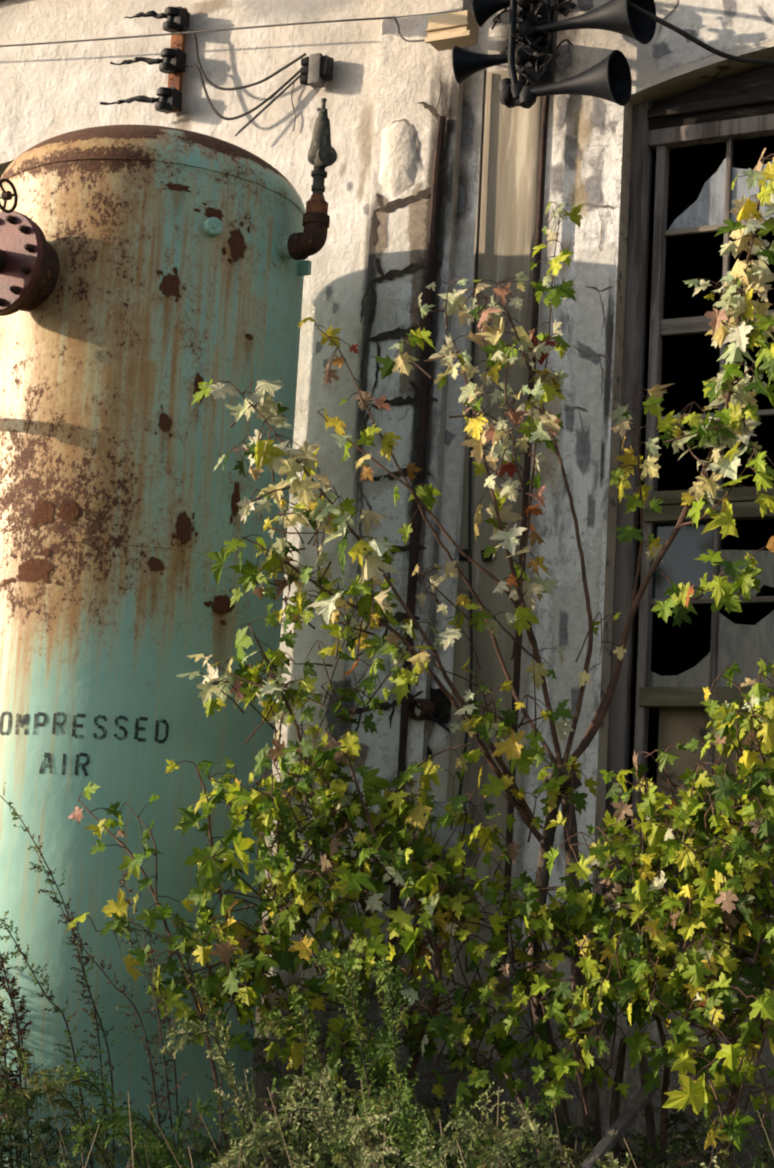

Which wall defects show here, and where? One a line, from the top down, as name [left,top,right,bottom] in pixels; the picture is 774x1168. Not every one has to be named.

flaking render [653,0,774,72]